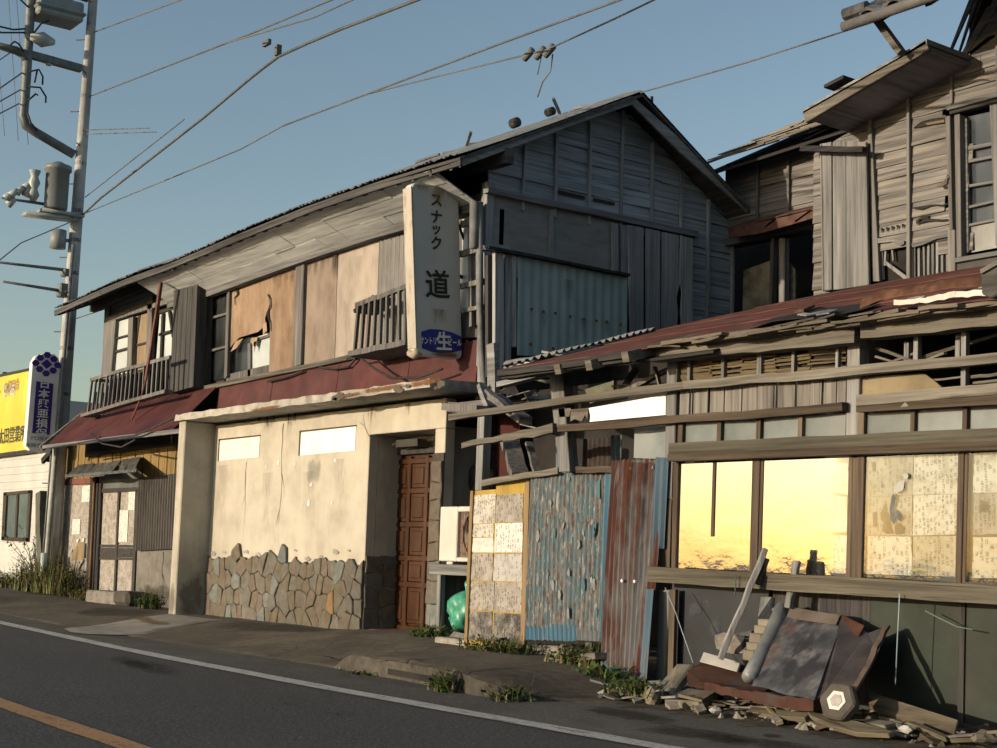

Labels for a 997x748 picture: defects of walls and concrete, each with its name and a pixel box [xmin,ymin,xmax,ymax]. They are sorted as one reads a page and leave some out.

corrosion [859,277,985,309]
peeling [231,322,267,352]
corrosion [622,462,652,577]